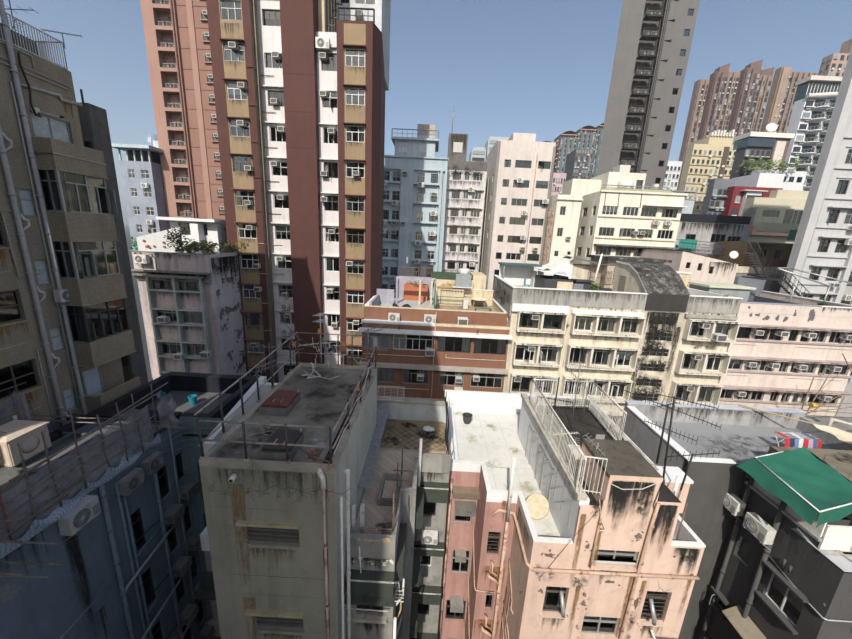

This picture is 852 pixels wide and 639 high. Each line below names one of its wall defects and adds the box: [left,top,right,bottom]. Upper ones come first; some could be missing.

spalling [220,302,246,373]
damp [591,307,681,407]
damp [609,481,655,510]
damp [652,505,677,535]
damp [676,548,699,565]